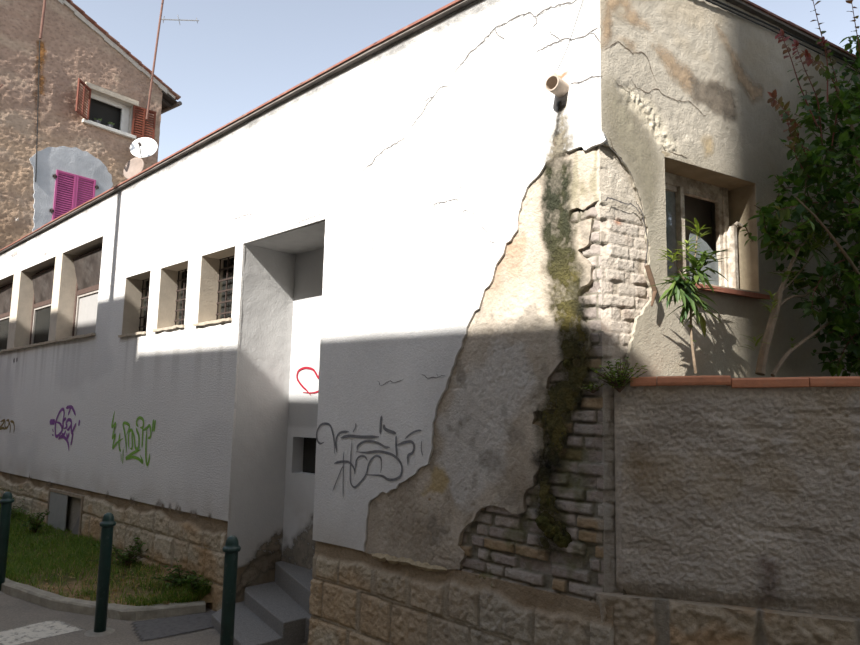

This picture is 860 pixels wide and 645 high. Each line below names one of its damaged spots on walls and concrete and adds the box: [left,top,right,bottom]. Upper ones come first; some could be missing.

crack [363,0,707,172]
water stain [546,101,573,162]
water stain [659,50,736,119]
peeling [363,143,649,603]